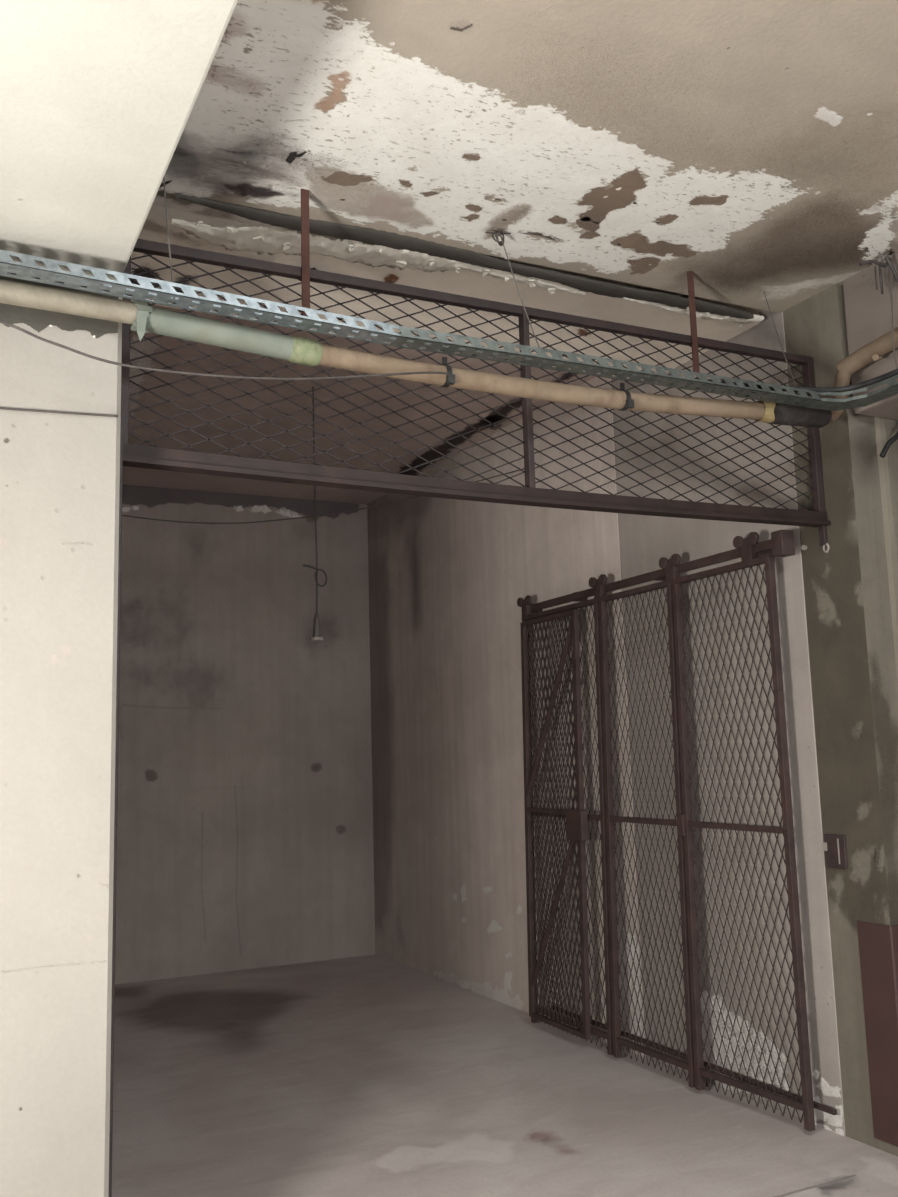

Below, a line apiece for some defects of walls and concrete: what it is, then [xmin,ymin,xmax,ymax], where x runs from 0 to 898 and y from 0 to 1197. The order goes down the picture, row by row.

water stain [165,125,354,203]
peeling [291,259,382,299]
peeling [142,0,821,275]
water stain [468,16,898,302]
water stain [798,410,898,935]